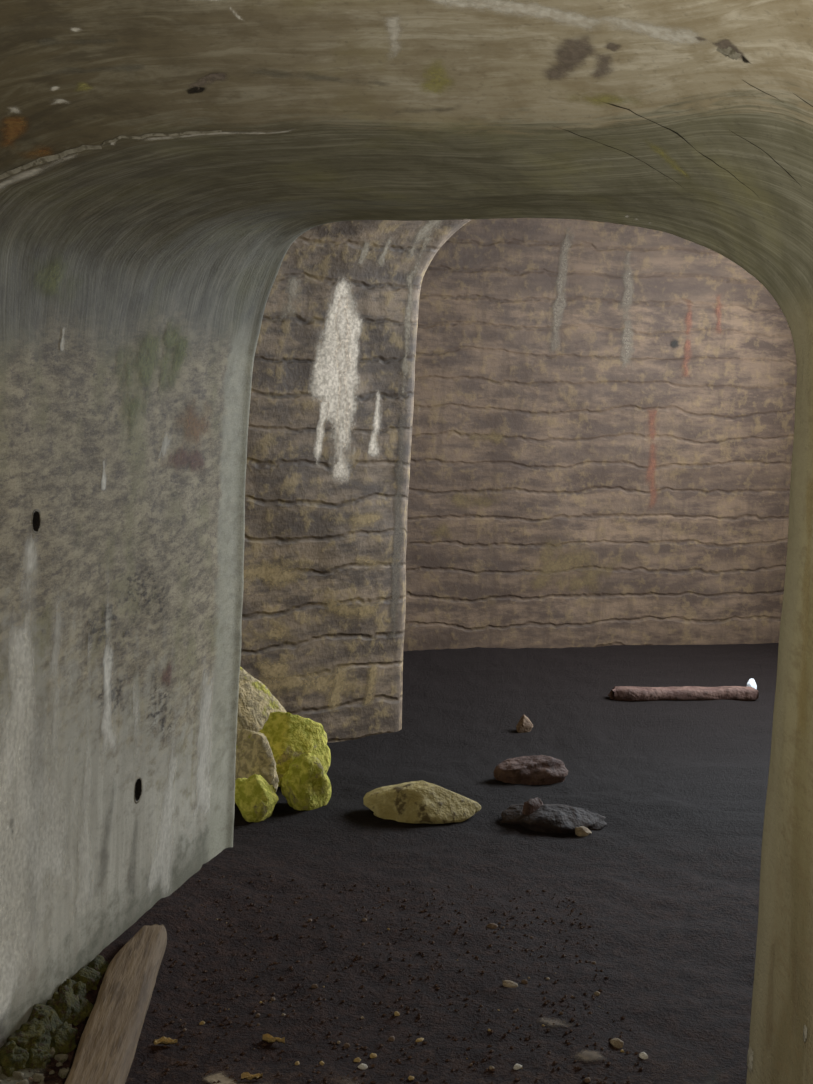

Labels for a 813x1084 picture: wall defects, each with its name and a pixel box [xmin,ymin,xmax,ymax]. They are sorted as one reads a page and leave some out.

crack [604,102,755,193]
leakage [311,280,362,480]
leakage [368,394,380,456]
leakage [26,541,36,589]
leakage [88,605,172,748]
leakage [194,678,212,814]
leakage [0,617,91,1021]
leakage [149,758,176,891]